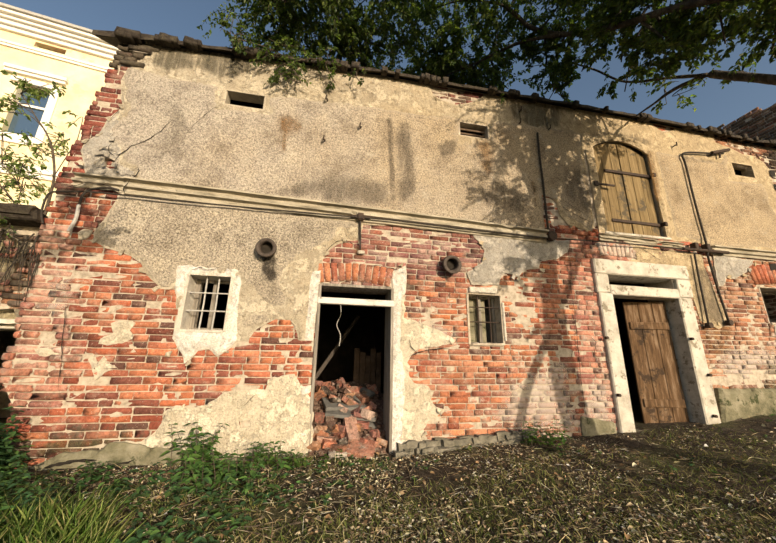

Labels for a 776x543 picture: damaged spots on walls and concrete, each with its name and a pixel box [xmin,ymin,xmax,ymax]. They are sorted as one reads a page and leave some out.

crack [68,121,171,193]
spalling [0,43,315,469]
spalling [323,195,776,443]
spalling [714,137,776,191]